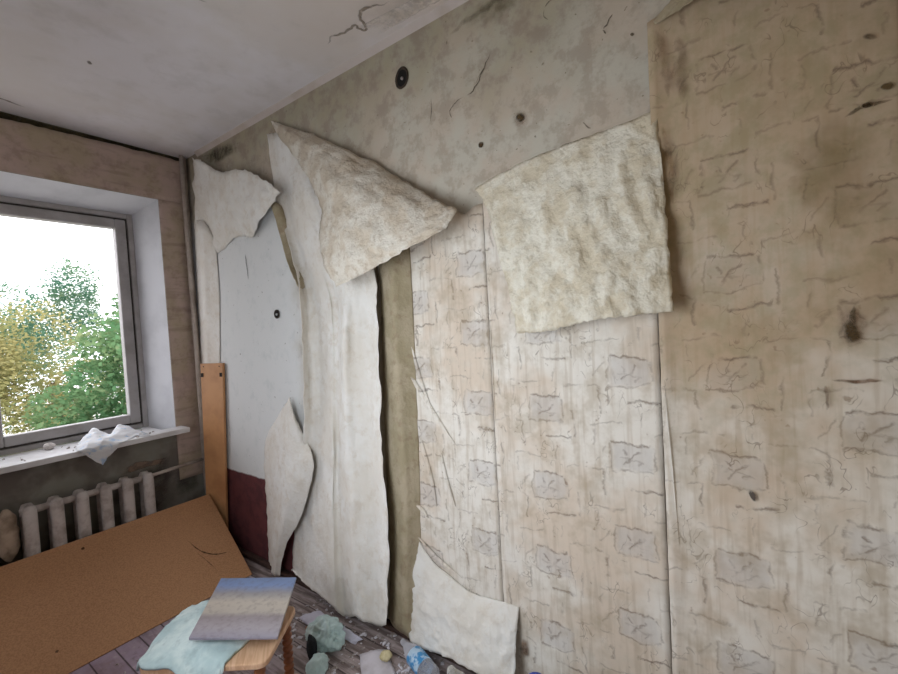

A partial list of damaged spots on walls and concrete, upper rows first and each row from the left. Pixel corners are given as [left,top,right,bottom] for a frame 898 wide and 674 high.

leakage [334,5,379,36]